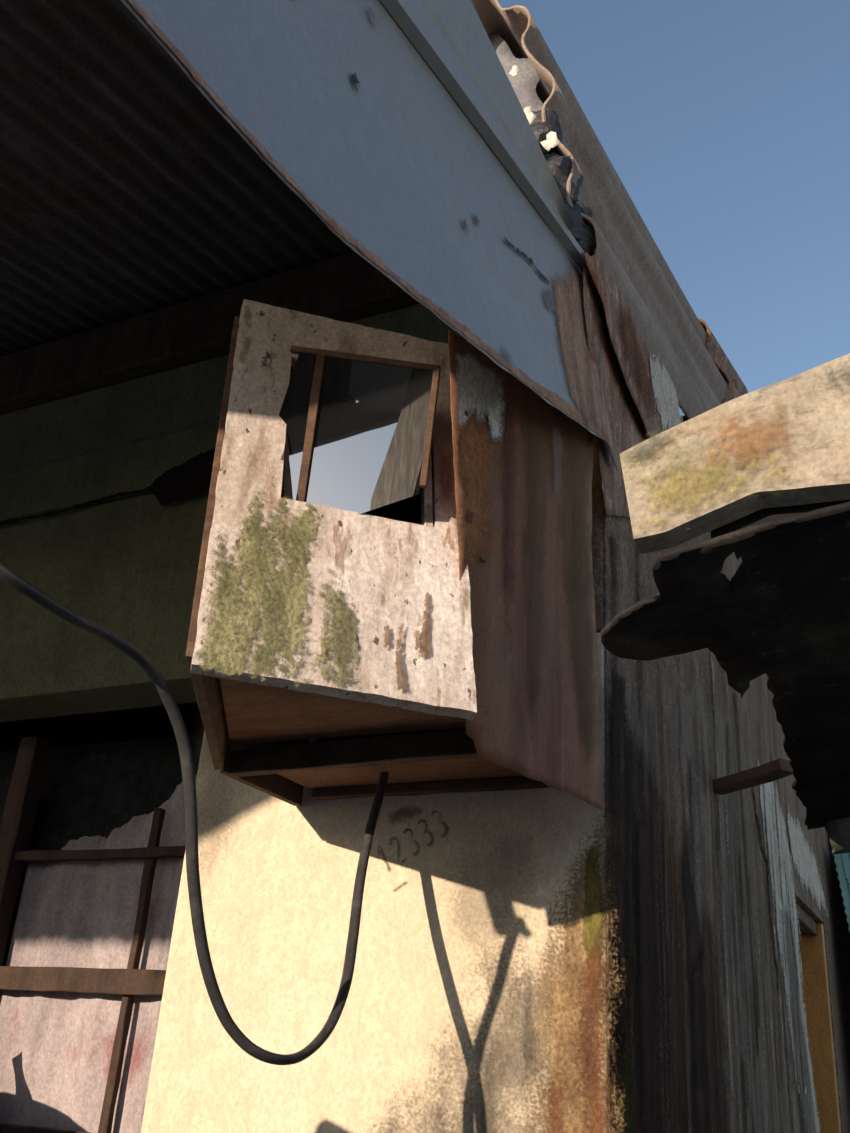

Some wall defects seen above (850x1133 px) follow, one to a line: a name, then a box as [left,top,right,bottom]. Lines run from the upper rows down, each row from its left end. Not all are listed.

rust [128,0,618,464]
rust [616,305,658,419]
crack [0,486,152,526]
spalling [150,446,216,506]
rust [454,402,517,594]
leakage [374,942,559,1133]
rust [526,808,622,1133]
peeling [758,781,828,1133]